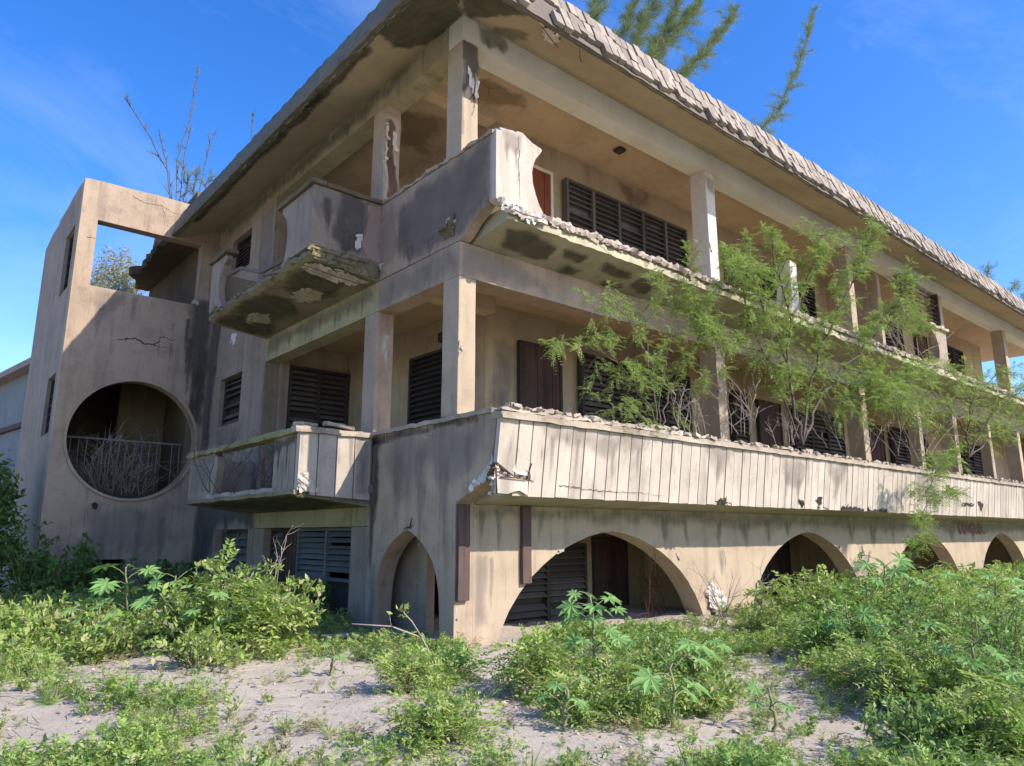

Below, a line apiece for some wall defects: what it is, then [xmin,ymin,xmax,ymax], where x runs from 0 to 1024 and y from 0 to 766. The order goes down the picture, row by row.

spalling [468,66,480,101]
spalling [301,116,400,286]
leakage [502,230,587,275]
peeling [398,143,933,366]
peeling [291,288,324,303]
leakage [601,264,655,294]
crack [117,336,175,348]
leakage [185,271,372,451]
spalling [297,471,319,493]
spalling [468,454,528,496]